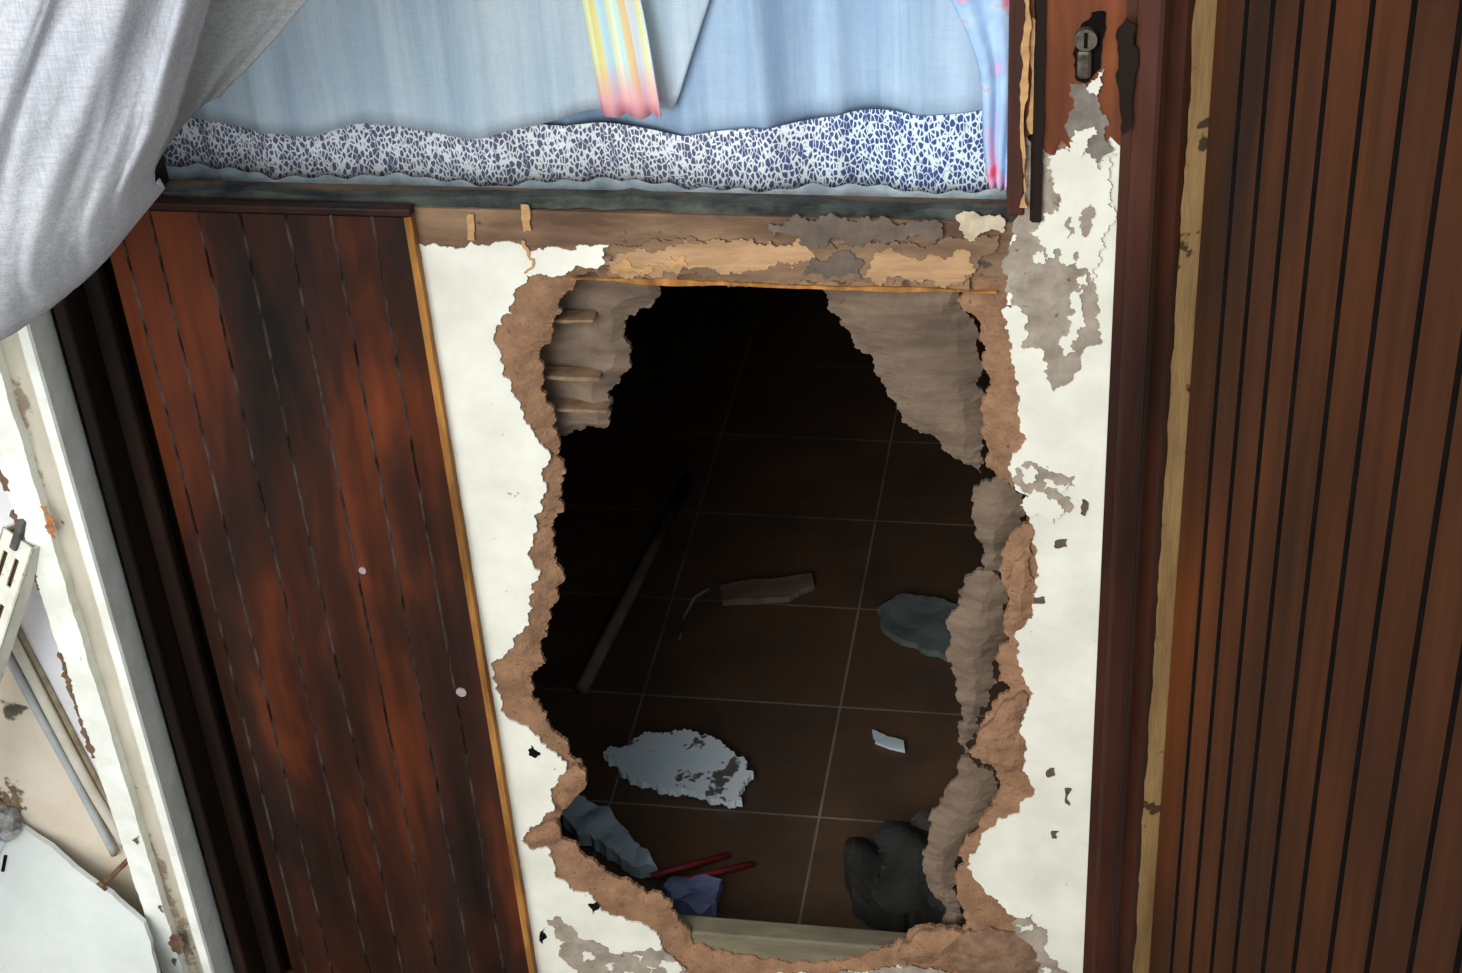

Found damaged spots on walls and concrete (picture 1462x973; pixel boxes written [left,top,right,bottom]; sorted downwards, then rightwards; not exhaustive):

peeling [1001,69,1117,391]
peeling [1019,465,1089,549]
peeling [539,916,687,973]
peeling [838,965,949,973]
peeling [1011,915,1068,973]